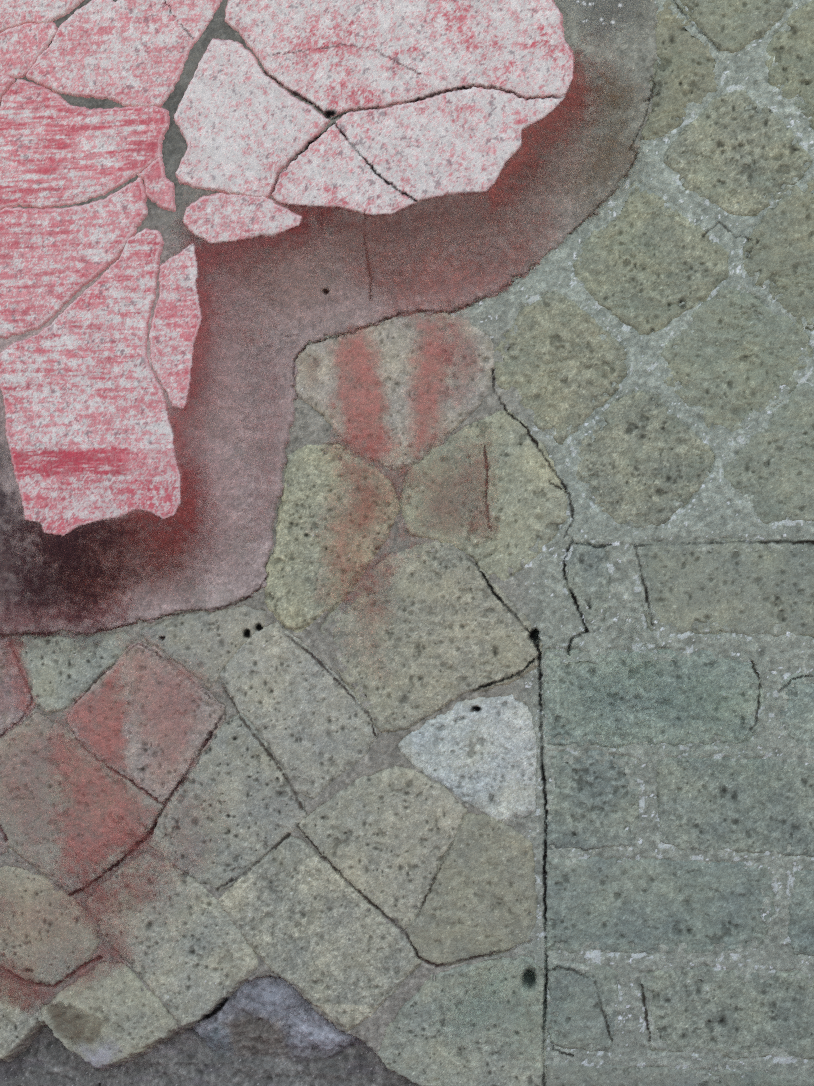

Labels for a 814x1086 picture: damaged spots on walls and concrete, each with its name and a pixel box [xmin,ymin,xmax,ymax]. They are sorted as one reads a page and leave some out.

damp [491,74,577,198]
damp [197,210,309,265]
peeling [0,0,658,637]
damp [0,278,209,626]
damp [333,336,391,458]
crack [480,571,509,609]
crack [492,370,605,655]
crack [761,538,814,546]
crack [750,660,809,730]
crack [477,628,583,1056]
spalling [193,976,362,1061]
crack [641,984,651,1041]